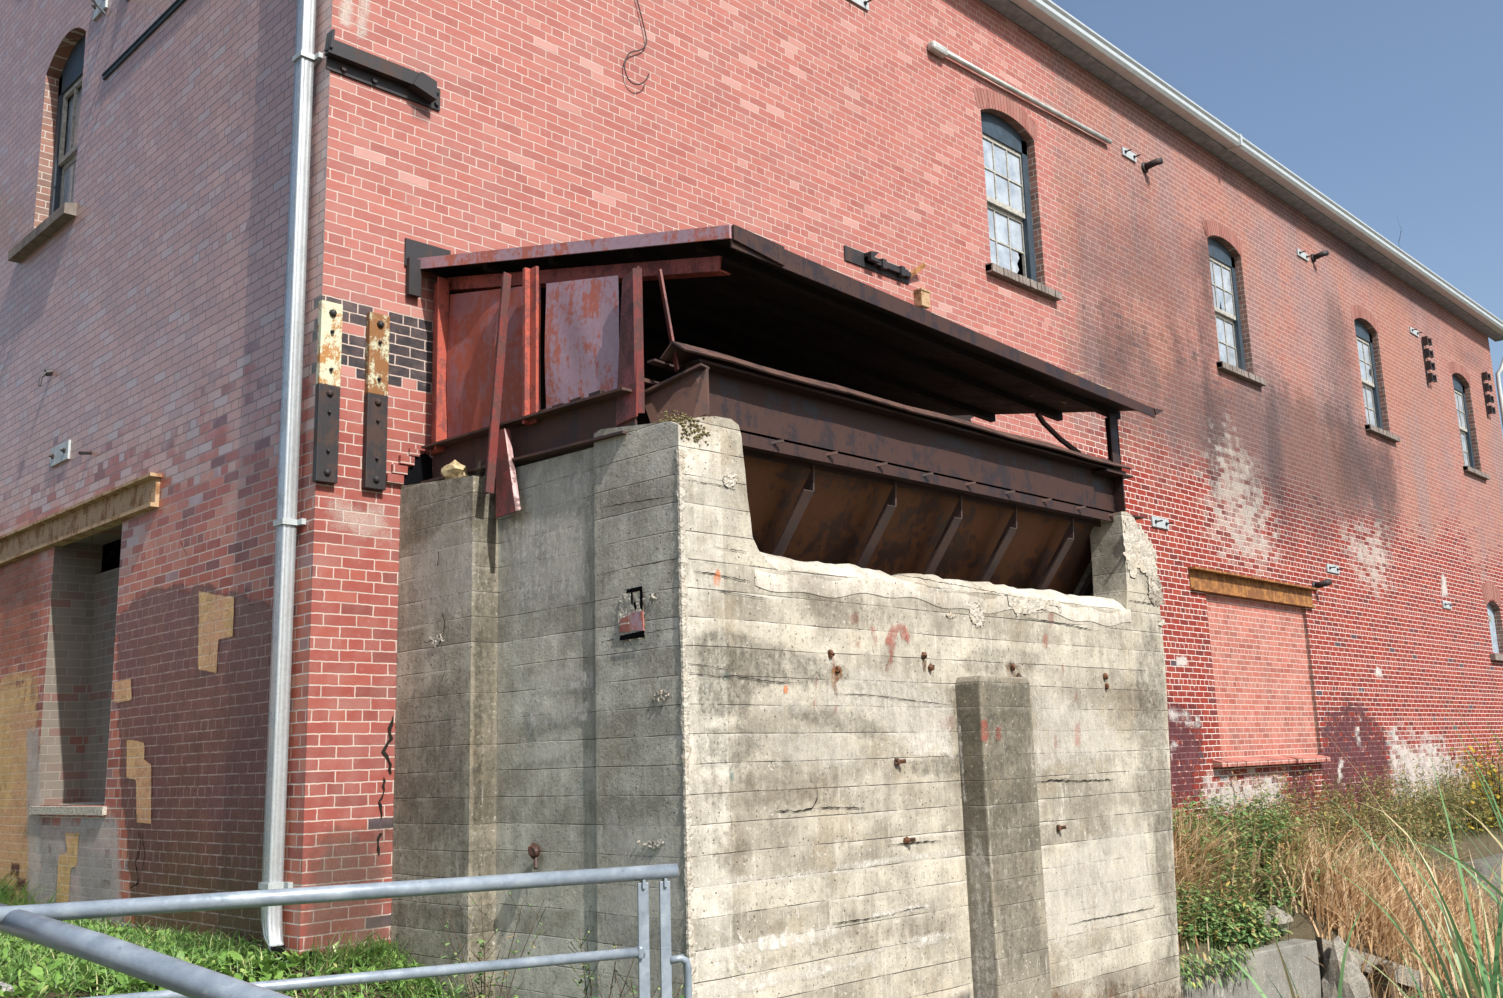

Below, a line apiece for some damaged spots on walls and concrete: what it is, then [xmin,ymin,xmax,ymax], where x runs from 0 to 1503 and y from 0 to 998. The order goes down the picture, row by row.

spalling [754,552,1132,628]
spalling [1123,517,1166,627]
peeling [0,670,42,904]
crack [377,717,393,855]
damp [849,672,966,801]